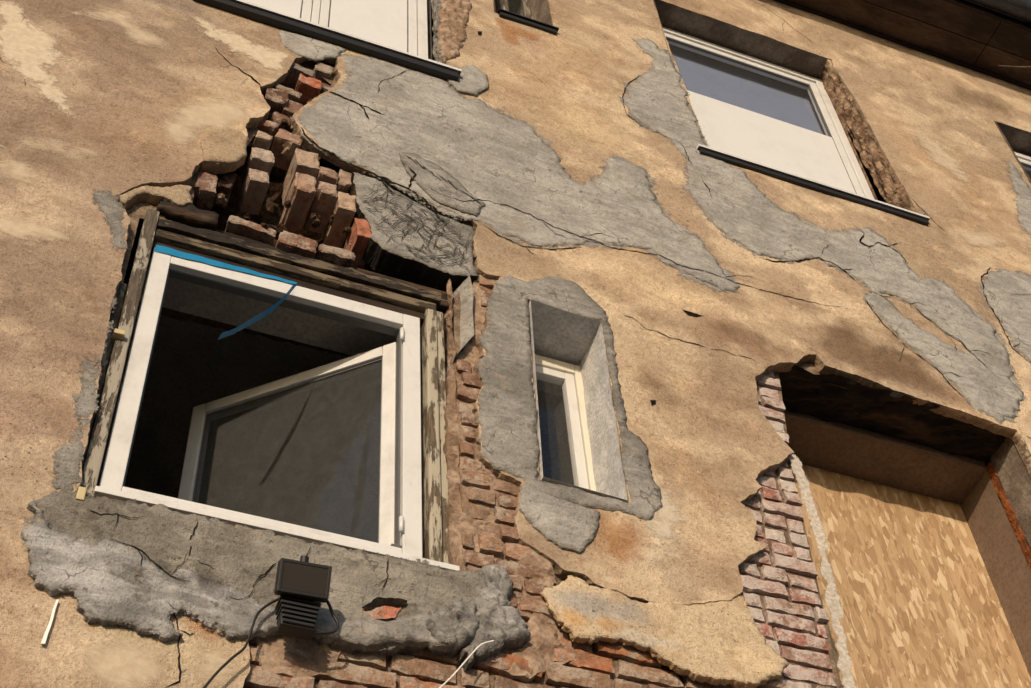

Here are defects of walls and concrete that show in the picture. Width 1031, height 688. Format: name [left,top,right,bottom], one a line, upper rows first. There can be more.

crack [215,47,261,86]
crack [322,69,412,118]
peeling [919,136,969,182]
spalling [122,218,144,307]
crack [294,122,988,397]
crack [981,268,1030,362]
spalling [151,17,857,688]
crack [87,509,215,581]
crack [231,563,276,600]
peeling [86,644,161,688]
crack [165,603,194,688]